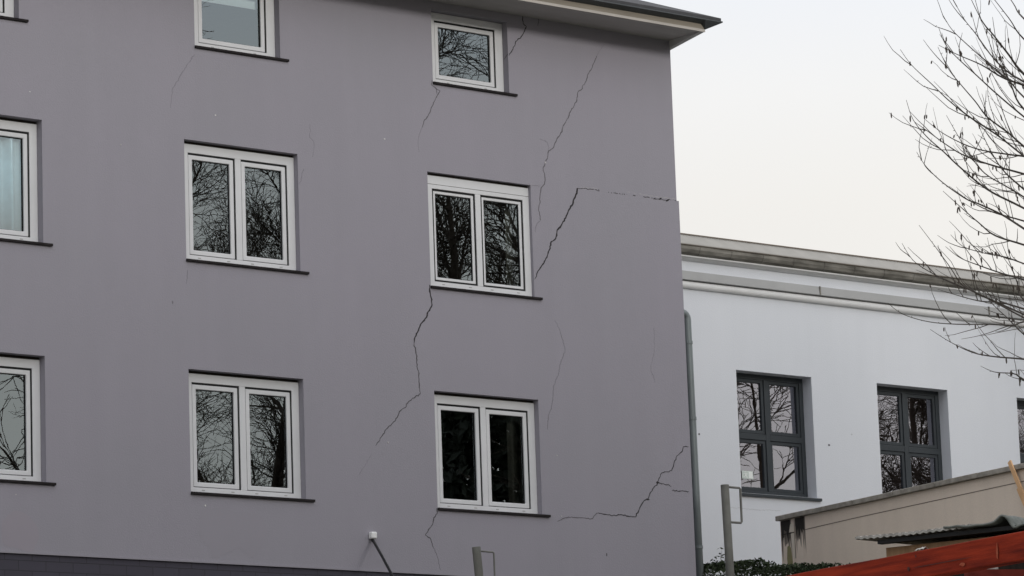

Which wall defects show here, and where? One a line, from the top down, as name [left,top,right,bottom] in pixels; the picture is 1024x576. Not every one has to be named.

crack [535,56,676,278]
crack [375,285,433,446]
crack [559,446,689,521]